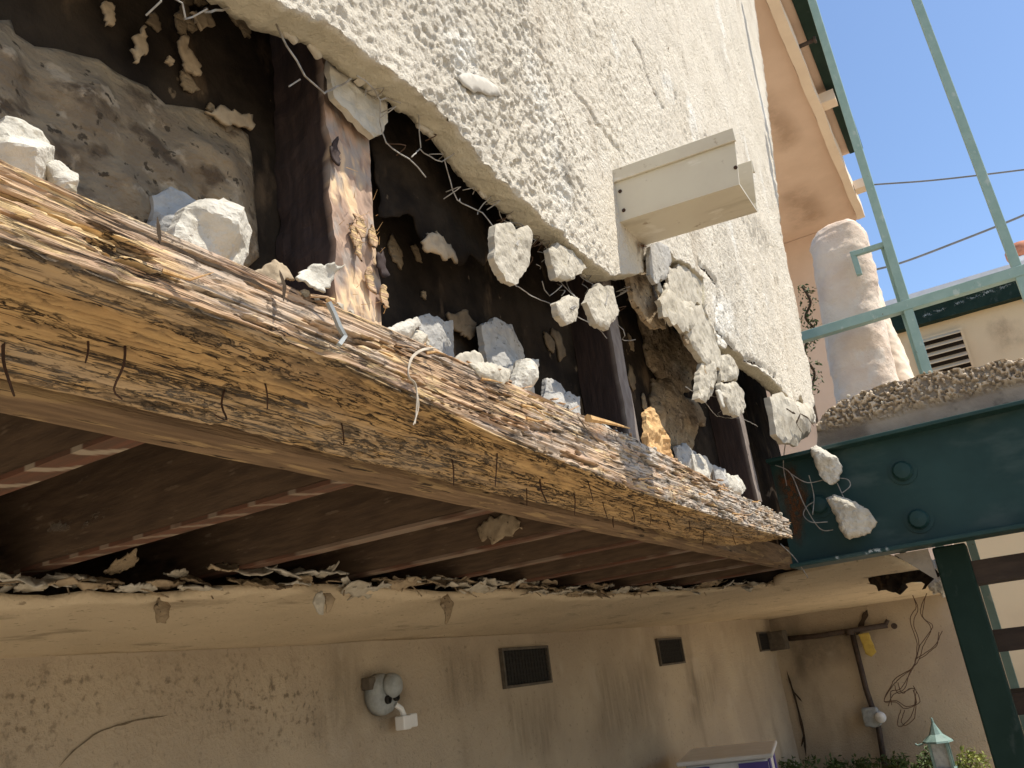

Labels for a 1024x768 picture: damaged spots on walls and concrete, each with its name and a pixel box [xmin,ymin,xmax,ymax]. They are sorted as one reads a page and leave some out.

spalling [282,32,323,60]
peeling [329,136,341,166]
spalling [415,124,434,138]
peeling [349,213,390,308]
peeling [624,242,725,409]
peeling [455,350,484,364]
rust [779,468,807,536]
peeling [0,548,774,624]
spalling [867,559,945,598]
crack [787,672,806,754]
crack [59,715,167,767]